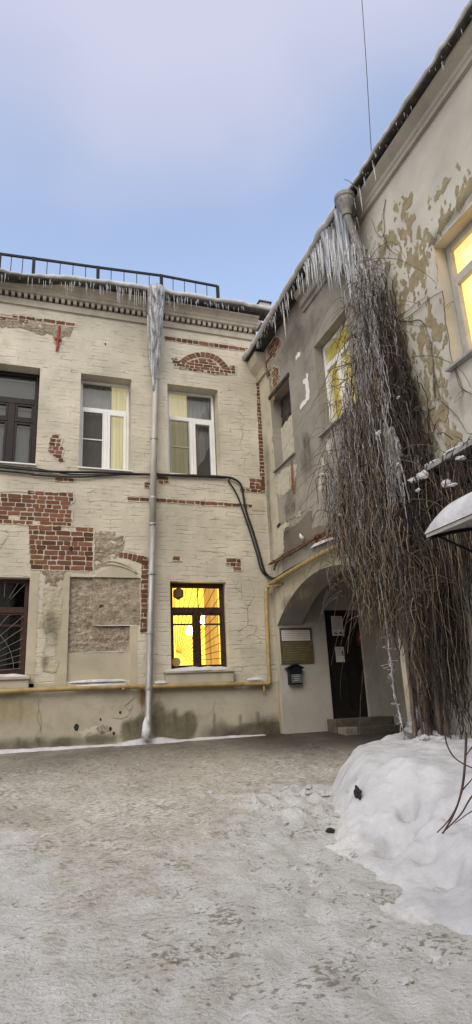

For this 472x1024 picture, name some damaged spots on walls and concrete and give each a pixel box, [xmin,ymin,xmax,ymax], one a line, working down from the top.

spalling [0,314,76,347]
peeling [377,163,472,458]
peeling [300,373,310,410]
flaking render [47,434,65,463]
flaking render [127,335,301,555]
peeling [318,437,333,492]
flaking render [0,477,149,673]
water stain [0,706,195,750]